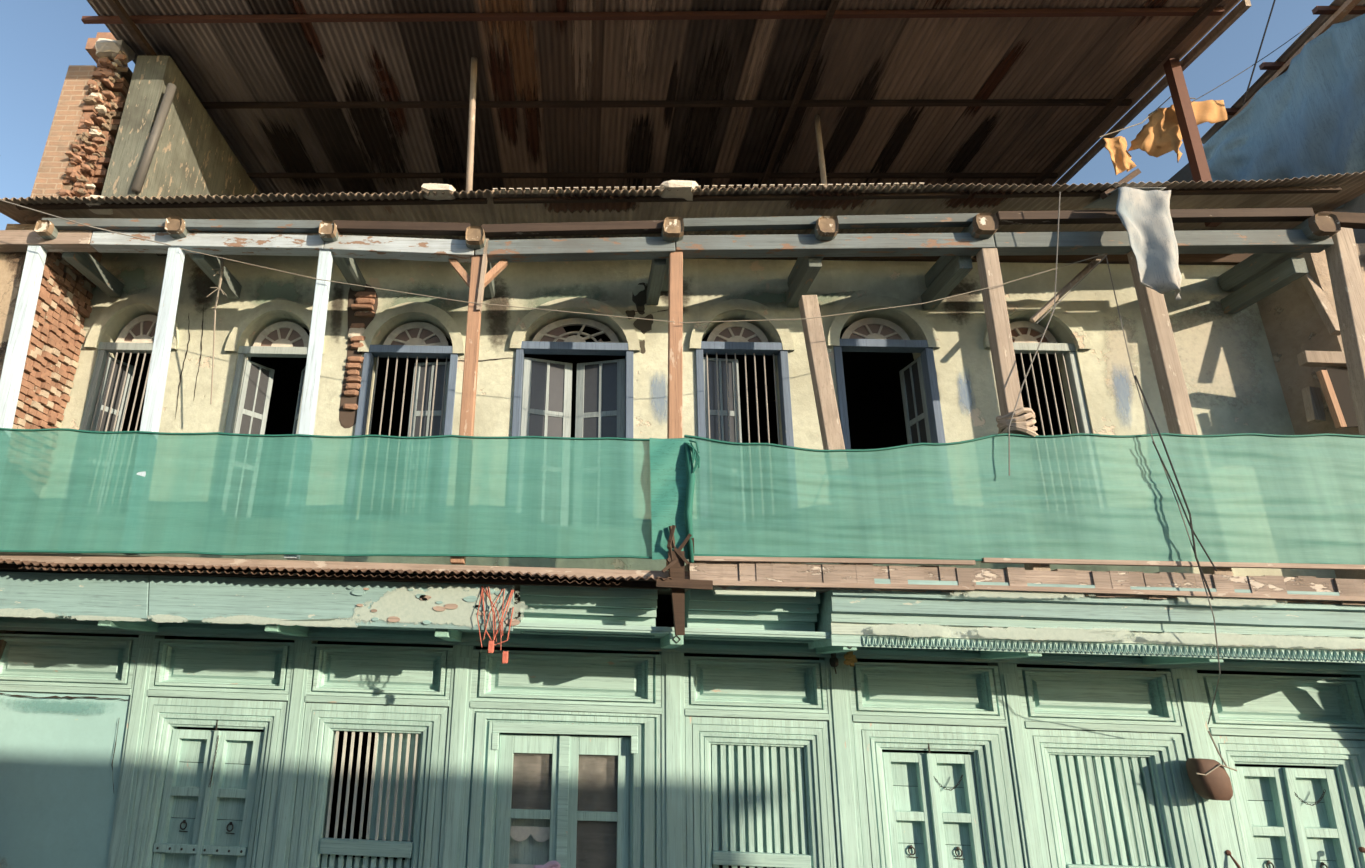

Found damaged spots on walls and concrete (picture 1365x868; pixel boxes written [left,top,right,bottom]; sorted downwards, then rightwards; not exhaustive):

rust [292,0,324,59]
rust [368,48,408,138]
rust [488,36,541,162]
rust [965,40,1030,115]
crack [175,307,204,418]
peeling [950,590,1092,599]
peeling [867,623,1365,649]
peeling [1176,596,1285,606]